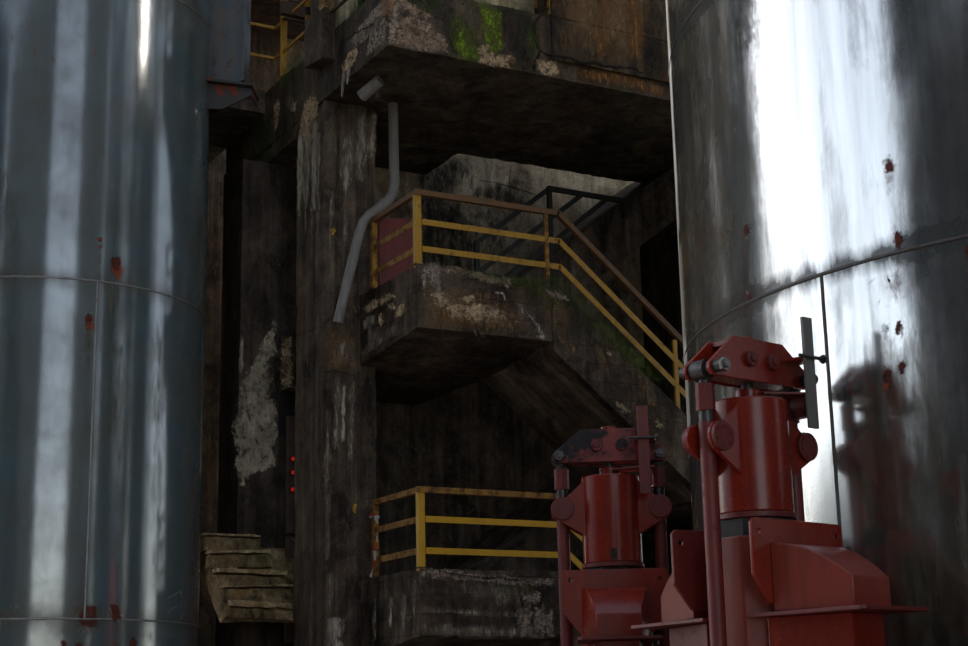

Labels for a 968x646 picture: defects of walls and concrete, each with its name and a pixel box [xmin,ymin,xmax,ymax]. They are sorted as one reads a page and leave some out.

spalling [341,0,451,96]
corrosion [99,257,125,278]
spalling [363,293,406,350]
spalling [420,262,519,333]
peeling [234,321,294,486]
corrosion [79,605,96,629]